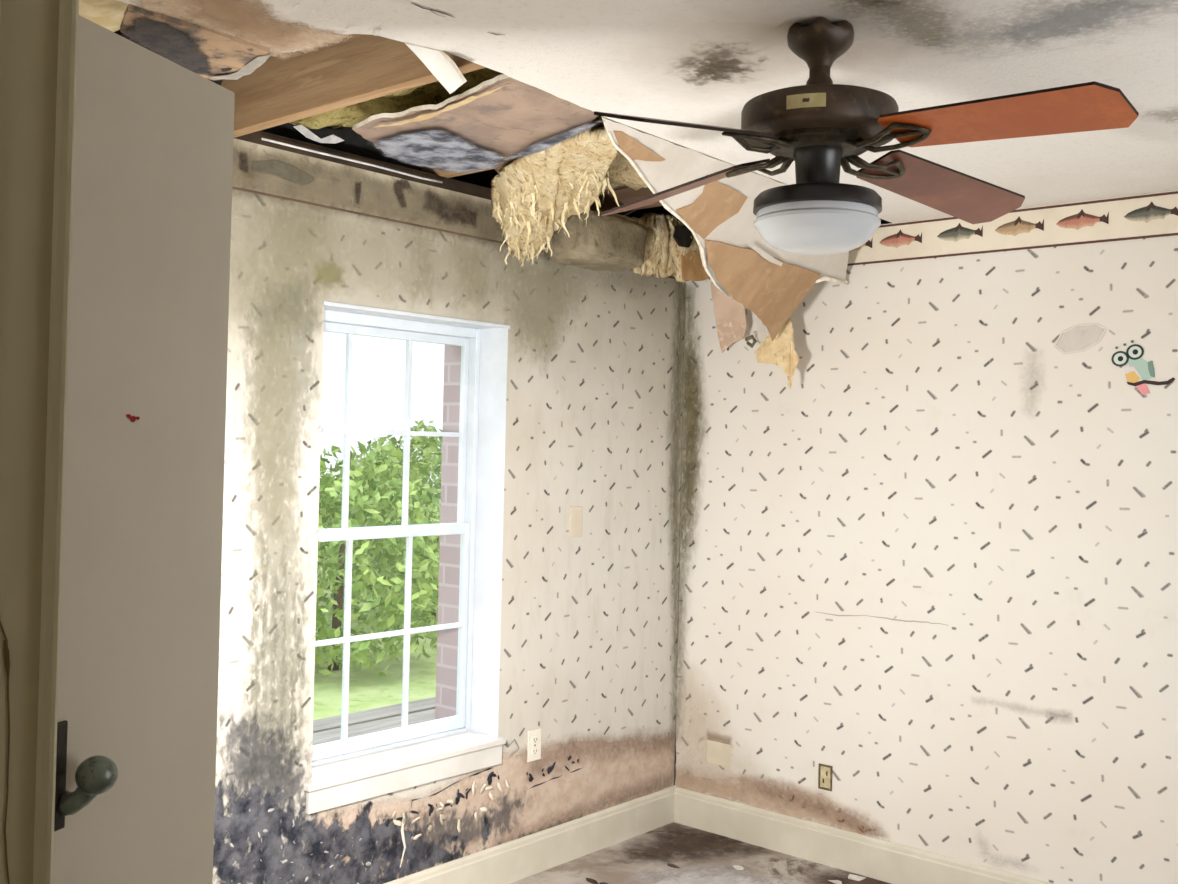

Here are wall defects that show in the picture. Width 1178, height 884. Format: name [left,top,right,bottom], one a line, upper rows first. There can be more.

peeling [140,0,358,57]
leakage [692,53,743,81]
leakage [371,121,600,173]
leakage [232,147,505,242]
leakage [671,284,699,679]
peeling [527,756,579,782]
peeling [386,772,510,840]